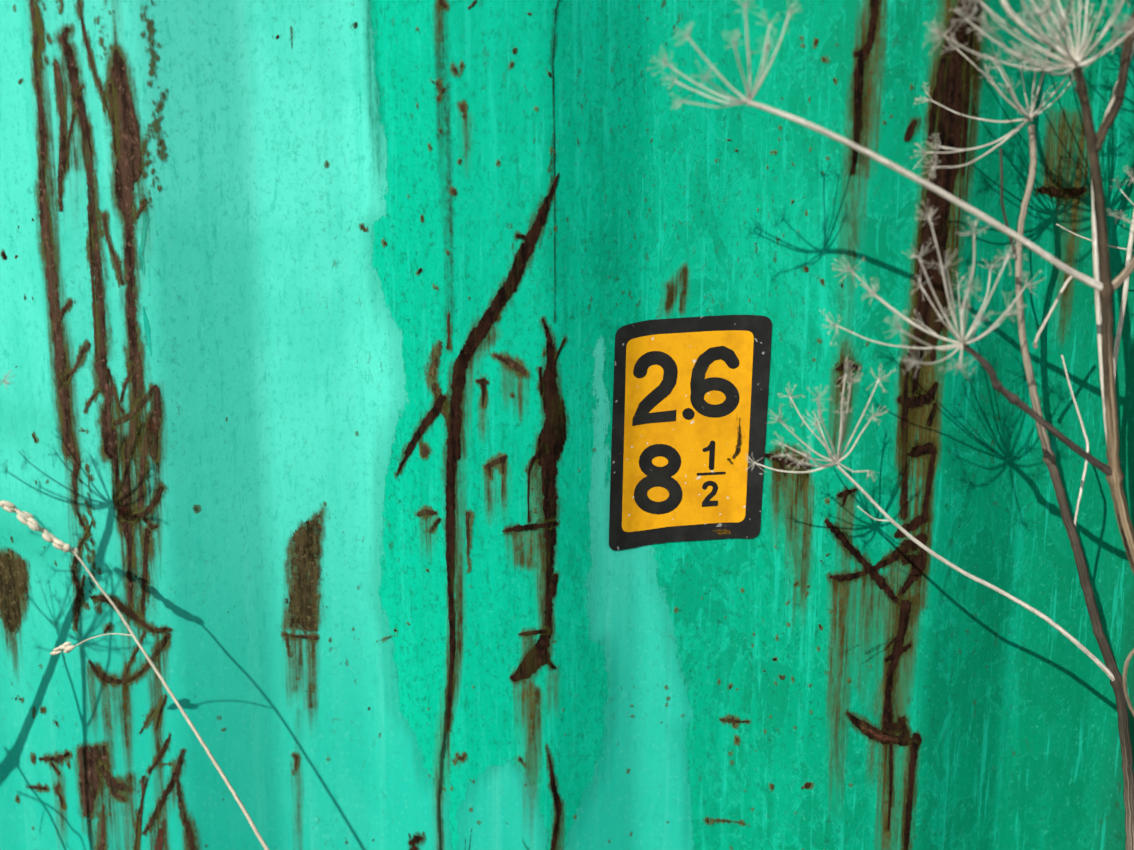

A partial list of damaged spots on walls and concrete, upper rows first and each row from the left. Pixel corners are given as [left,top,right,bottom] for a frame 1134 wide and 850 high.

corrosion [33,0,63,70]
corrosion [138,0,168,207]
corrosion [475,377,489,418]
corrosion [490,352,529,412]
corrosion [764,0,983,755]
corrosion [482,453,507,511]
corrosion [0,536,30,657]
corrosion [79,464,172,782]
corrosion [281,502,332,709]
corrosion [15,745,79,830]
corrosion [83,773,146,850]
corrosion [408,681,467,850]